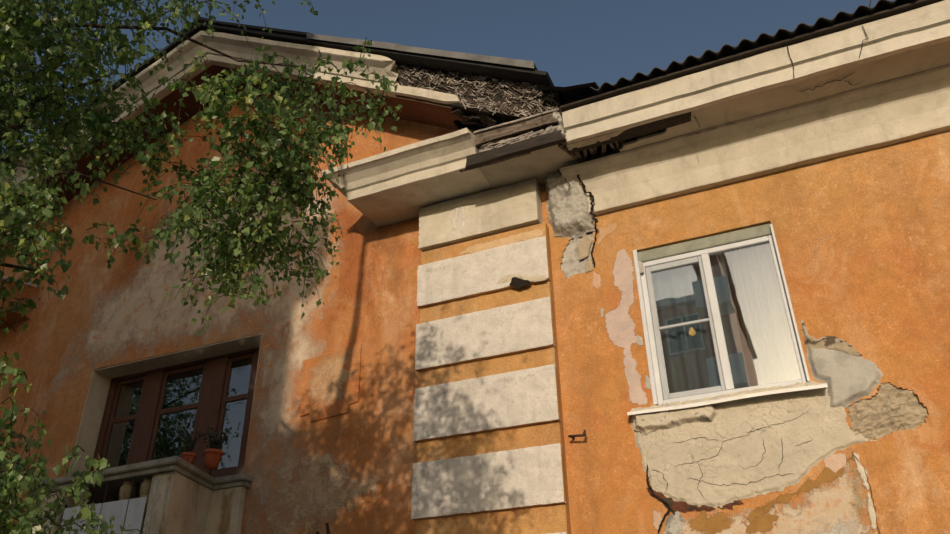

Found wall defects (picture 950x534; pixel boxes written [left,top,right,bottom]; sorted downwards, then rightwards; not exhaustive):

crack [787,26,868,92]
spalling [558,112,700,163]
crack [557,170,598,267]
flaking render [459,171,929,534]
crack [646,465,684,534]